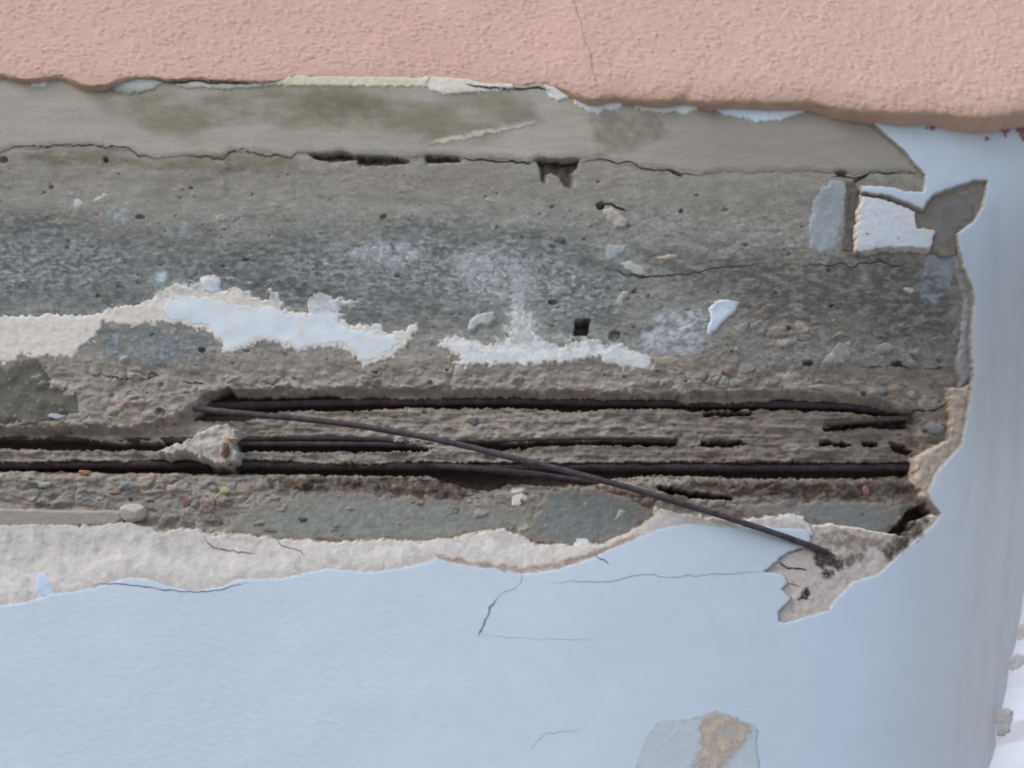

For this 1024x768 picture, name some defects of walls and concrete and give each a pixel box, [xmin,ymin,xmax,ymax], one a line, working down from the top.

crack [2,143,299,160]
crack [463,157,535,165]
hole [538,162,577,188]
crack [585,158,692,177]
crack [604,263,760,279]
leakage [149,270,271,302]
leakage [279,236,630,348]
spalling [0,186,983,622]
rust [267,476,479,498]
rust [691,481,907,500]
rust [448,539,626,572]
peeling [634,709,760,768]